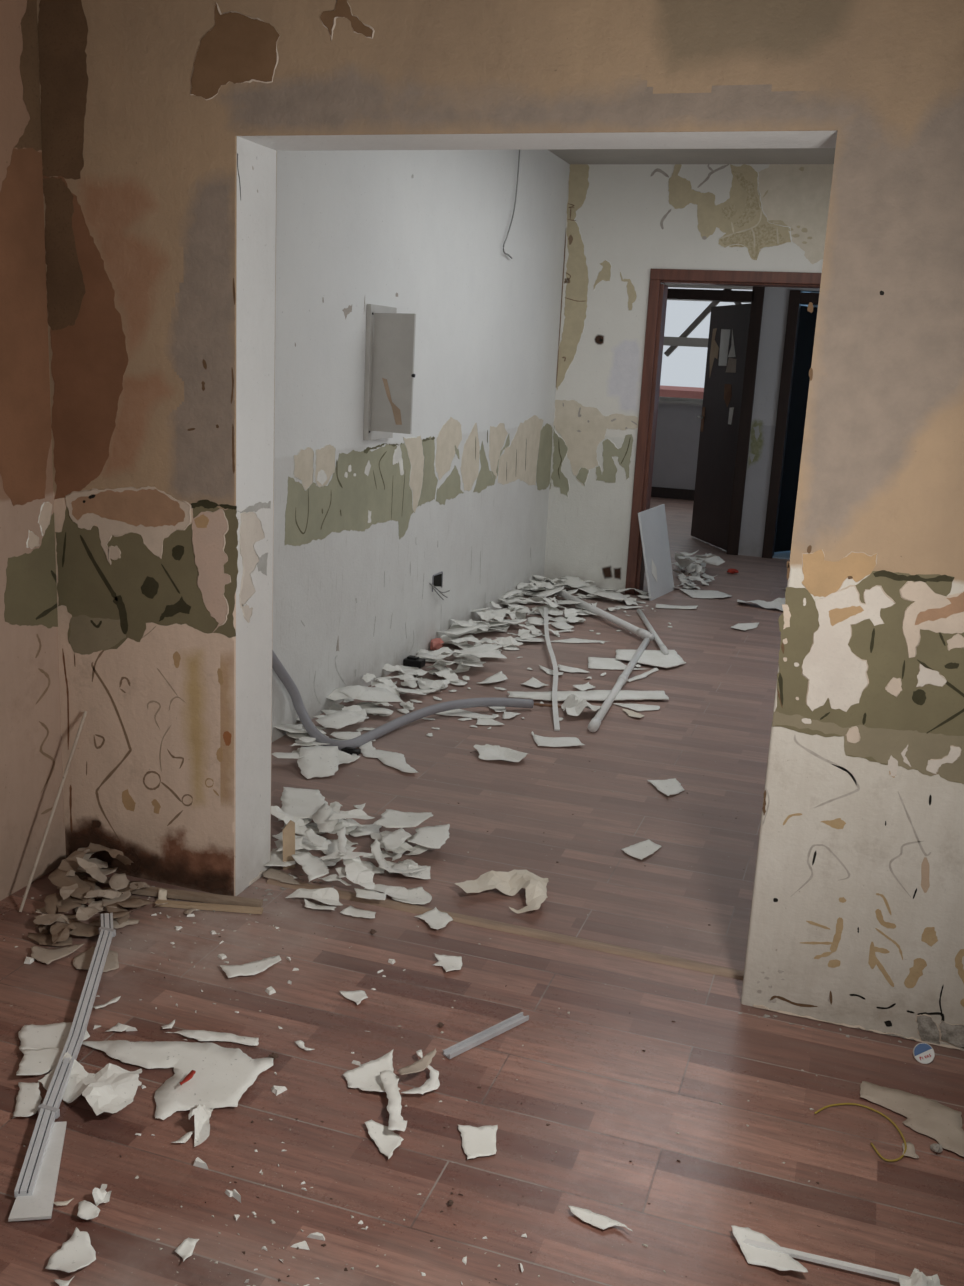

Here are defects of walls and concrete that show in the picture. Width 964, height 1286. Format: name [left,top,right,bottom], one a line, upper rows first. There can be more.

peeling [320,0,375,41]
peeling [190,3,280,100]
peeling [651,164,834,264]
peeling [556,164,637,432]
peeling [344,461,371,478]
peeling [393,444,404,475]
peeling [28,502,52,549]
flaking render [781,545,878,667]
peeling [947,634,964,650]
peeling [886,664,947,696]
peeling [846,727,860,743]
peeling [888,745,961,777]